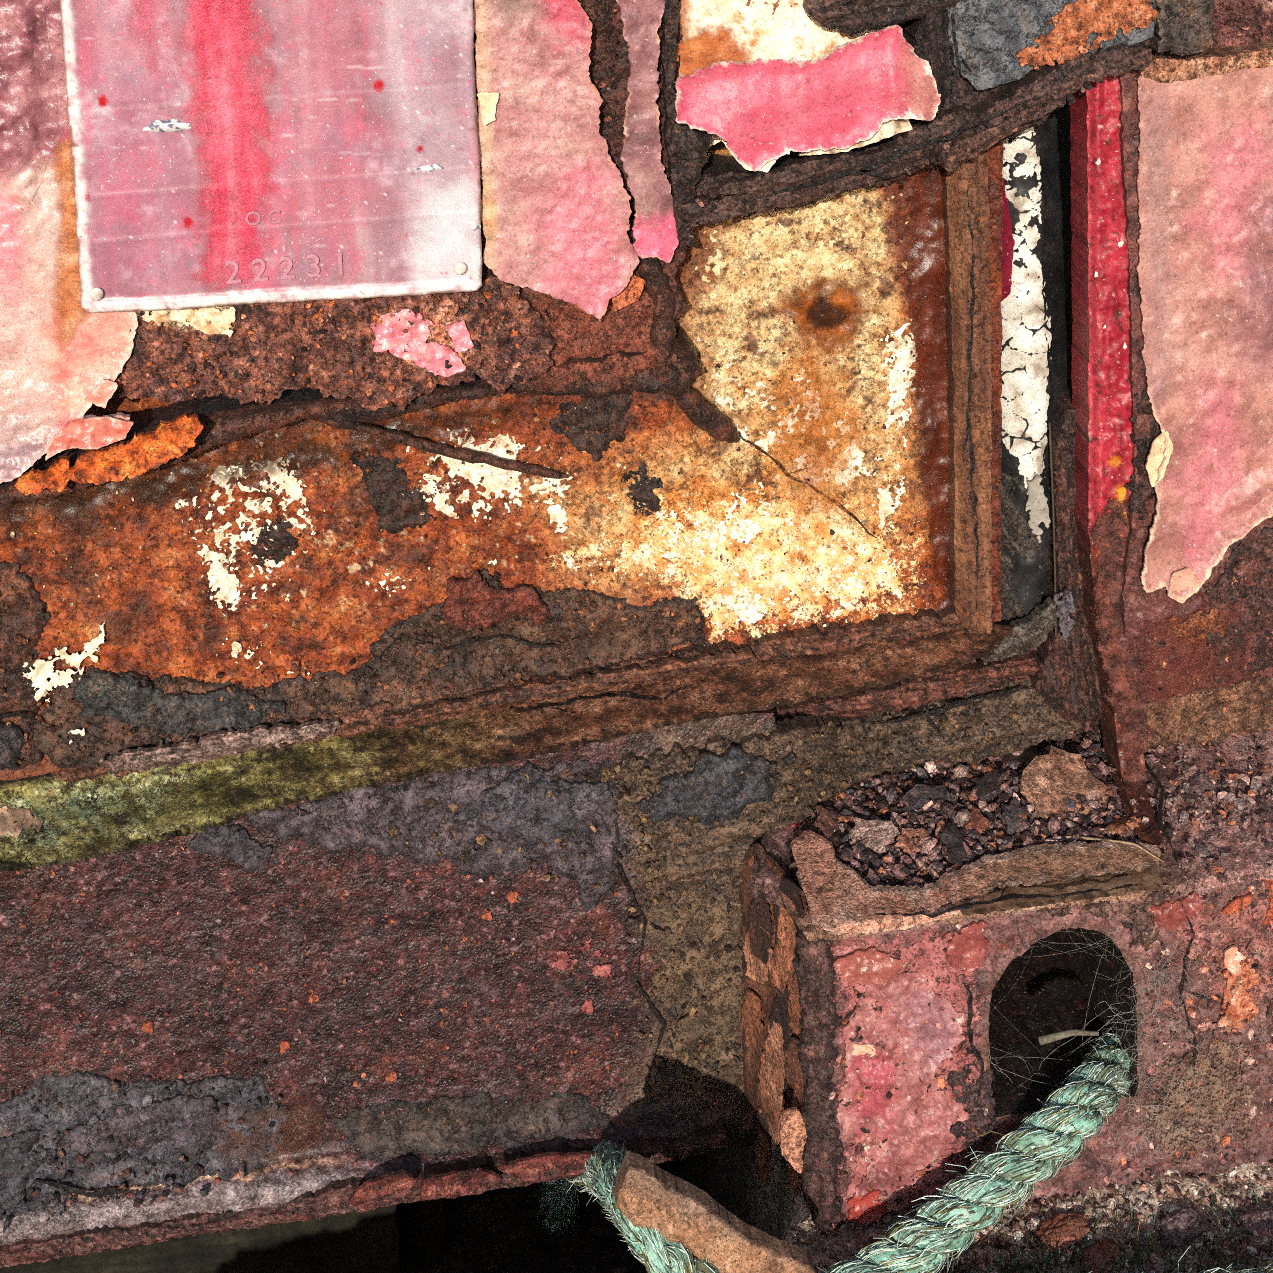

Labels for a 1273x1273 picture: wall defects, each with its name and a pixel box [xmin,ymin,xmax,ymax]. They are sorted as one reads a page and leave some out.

peeling [469,0,679,321]
peeling [675,24,941,172]
corrosion [1016,0,1159,69]
crack [1040,143,1056,481]
peeling [45,379,134,460]
peeling [175,453,316,616]
corrosion [14,170,967,783]
crack [739,431,877,538]
peeling [1118,66,1273,749]
corrosion [505,890,519,904]
corrosion [142,1020,153,1034]
corrosion [279,1040,290,1054]